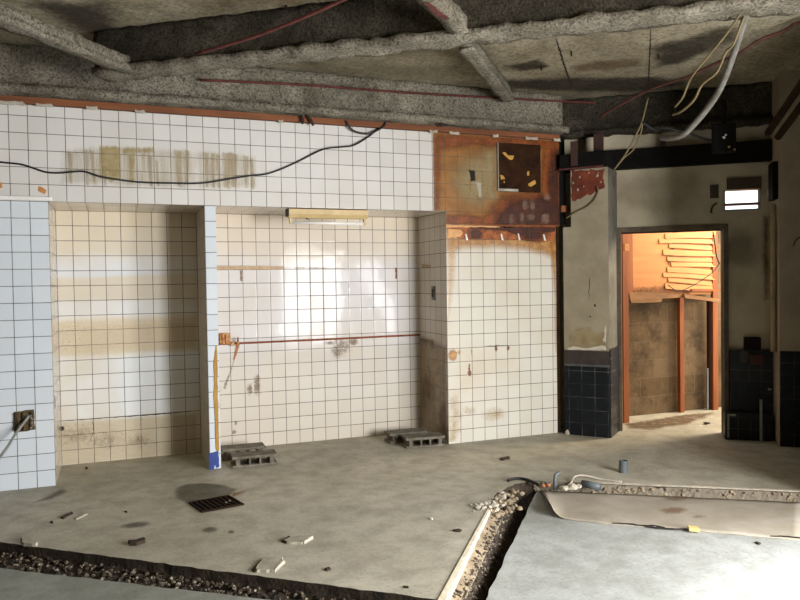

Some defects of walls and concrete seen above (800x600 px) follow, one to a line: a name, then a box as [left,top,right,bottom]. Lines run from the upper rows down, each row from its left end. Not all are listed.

leakage [507,60,684,92]
leakage [100,147,134,181]
corrosion [433,133,560,295]
leakage [421,339,446,439]